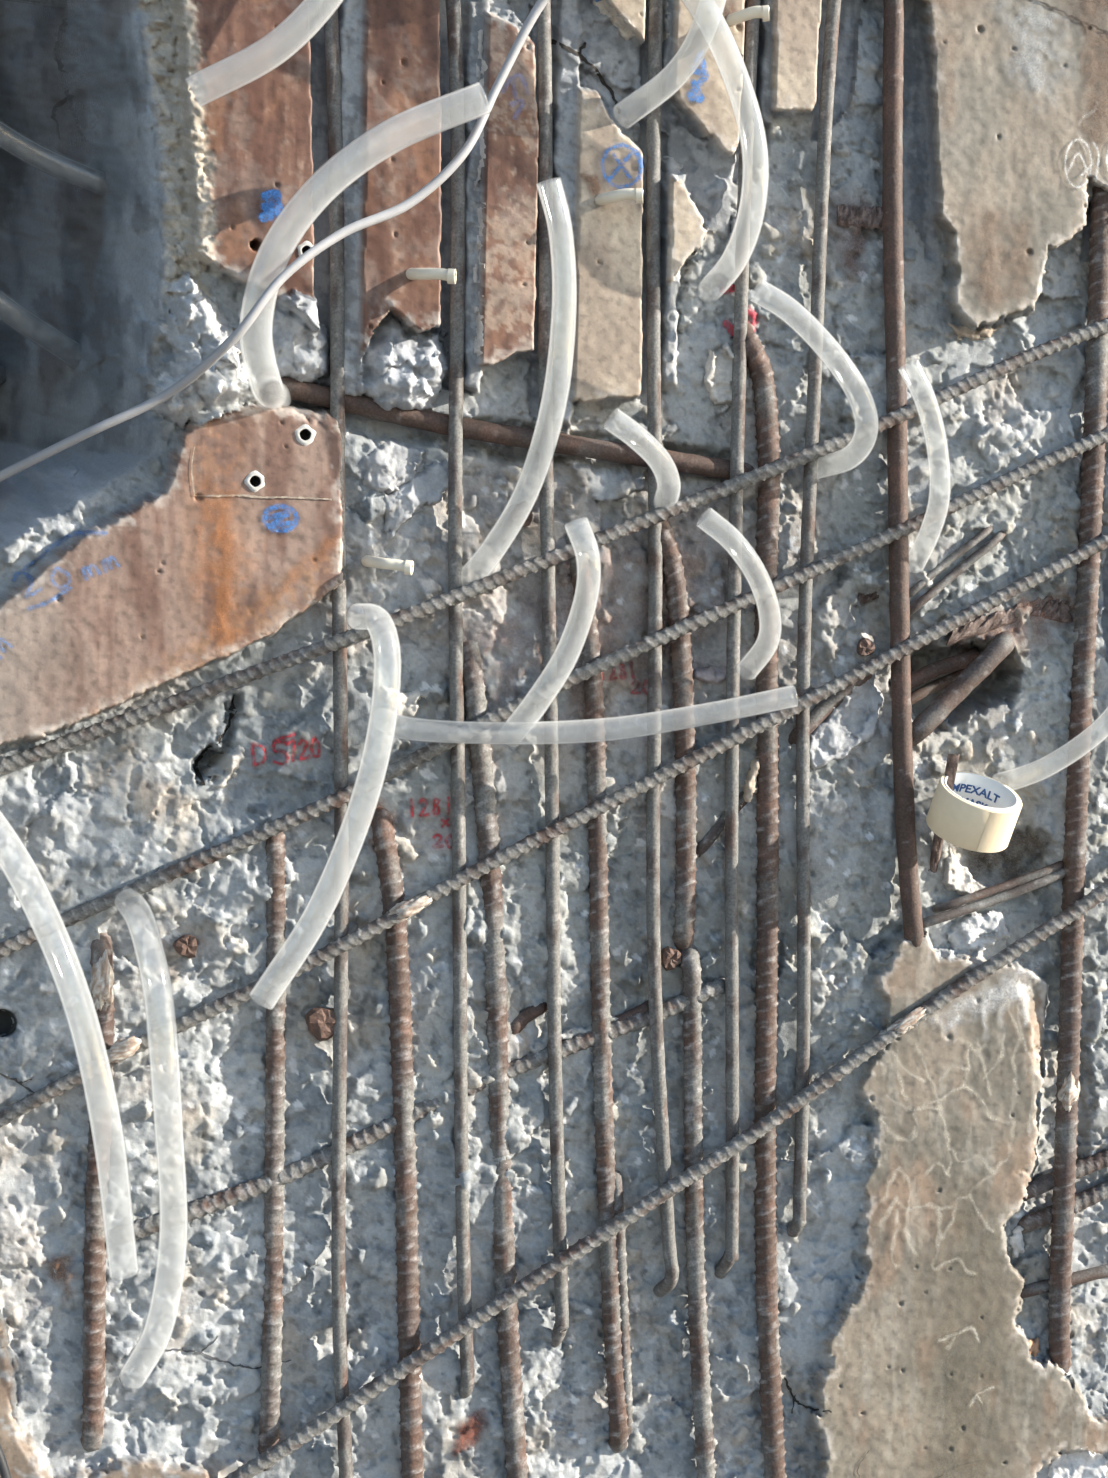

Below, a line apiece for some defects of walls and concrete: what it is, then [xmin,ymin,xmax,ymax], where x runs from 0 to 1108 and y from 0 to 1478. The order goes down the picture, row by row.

crack [1035,0,1108,39]
spalling [0,0,1108,942]
spalling [0,411,1108,1478]
crack [938,1327,979,1346]
rust [454,1414,483,1455]